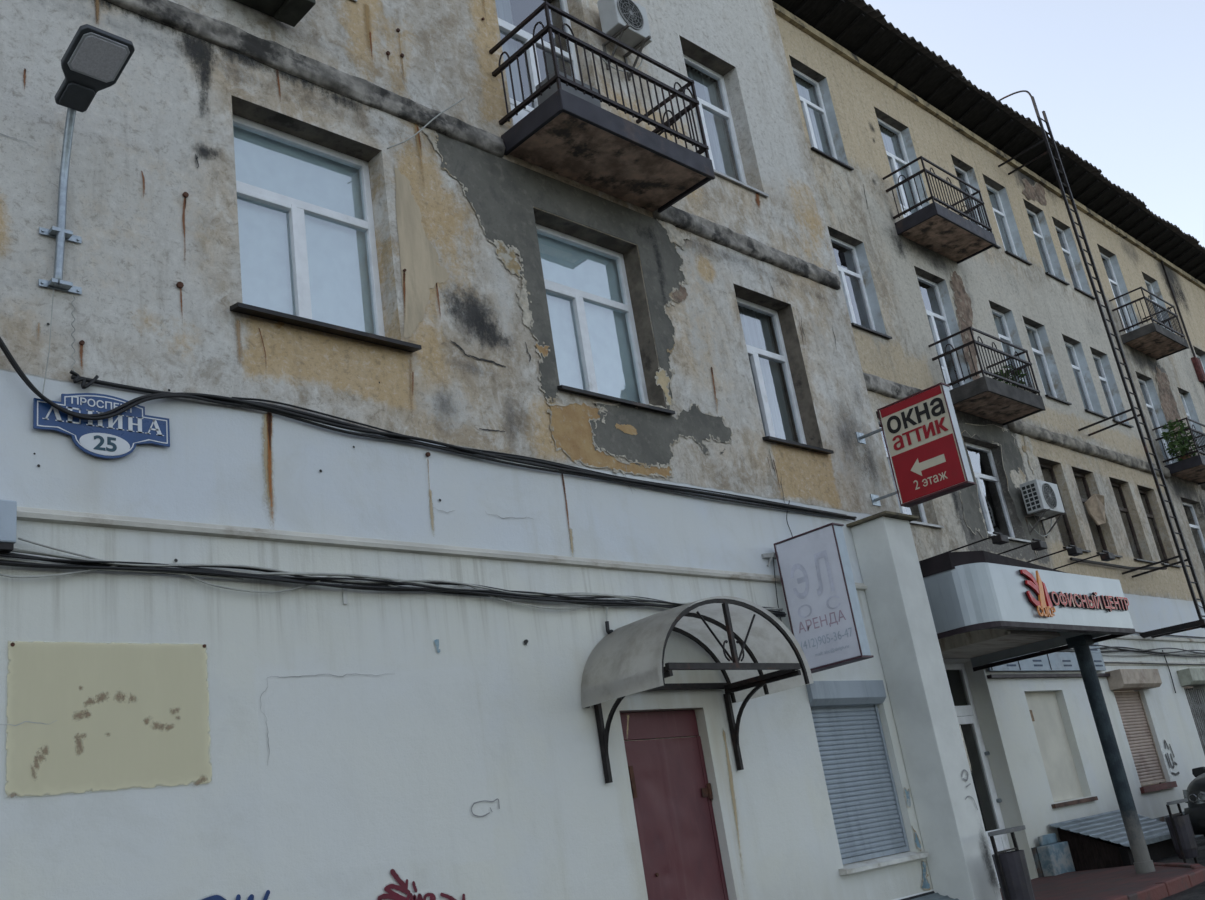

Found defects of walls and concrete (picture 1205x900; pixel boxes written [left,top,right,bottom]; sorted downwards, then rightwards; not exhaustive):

leakage [127,9,262,113]
leakage [280,70,313,90]
flaking render [419,125,732,480]
rust [263,412,273,519]
crack [260,674,383,763]